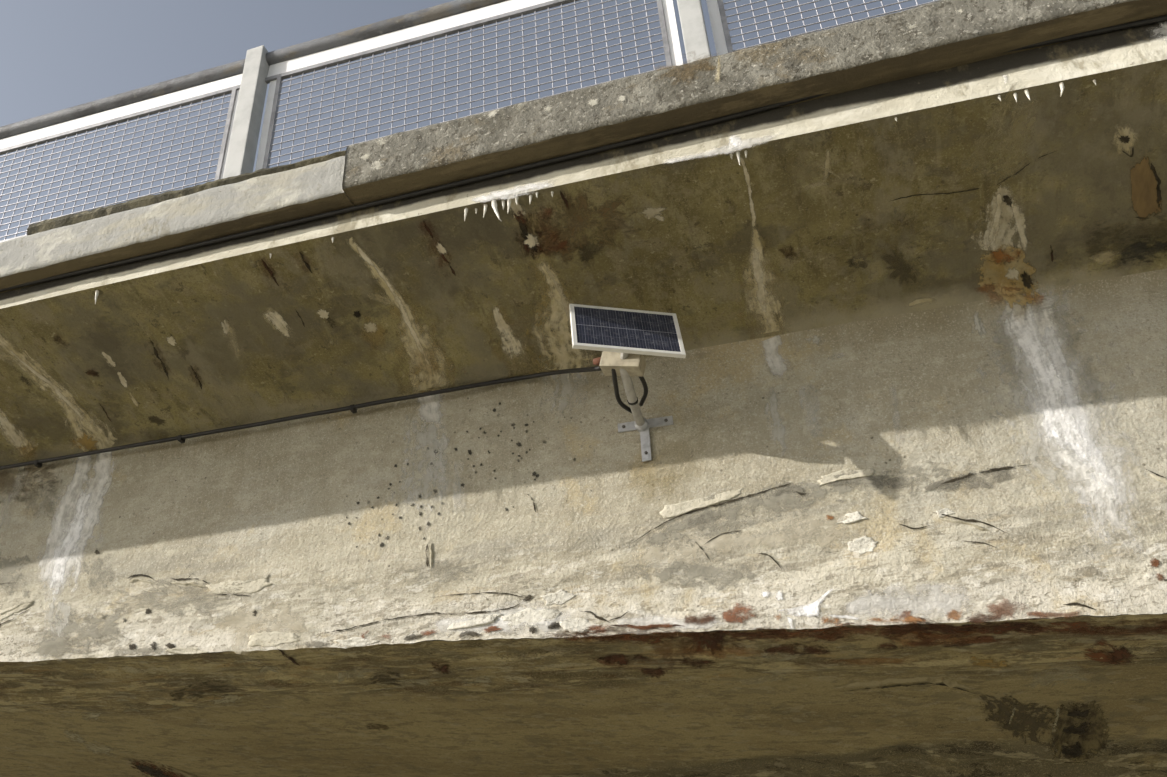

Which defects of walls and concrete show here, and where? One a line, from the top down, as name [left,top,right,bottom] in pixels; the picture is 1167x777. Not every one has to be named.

spalling [1116,127,1162,220]
damp [667,136,787,375]
damp [346,237,496,540]
damp [0,334,118,636]
crack [1146,469,1167,485]
crack [314,592,532,636]
rust [542,600,1167,678]
spalling [132,759,200,777]
spalling [980,695,1109,763]